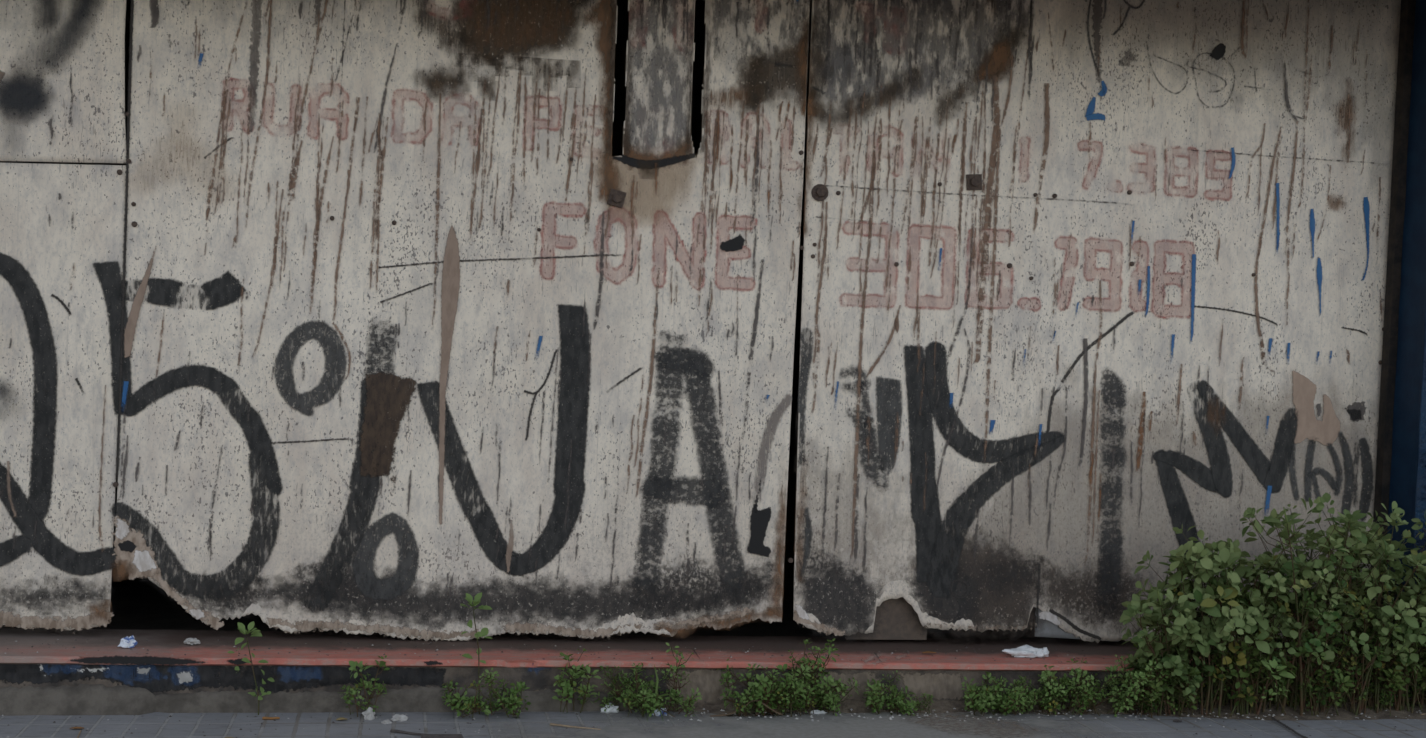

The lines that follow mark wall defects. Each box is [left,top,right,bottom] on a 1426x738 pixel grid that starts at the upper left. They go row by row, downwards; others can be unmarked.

water stain [480,425,541,579]
water stain [604,477,619,588]
spalling [112,516,224,630]
spalling [0,600,114,634]
spalling [266,617,479,641]
spalling [503,604,845,638]
spalling [925,611,1060,632]
peeling [0,656,446,693]